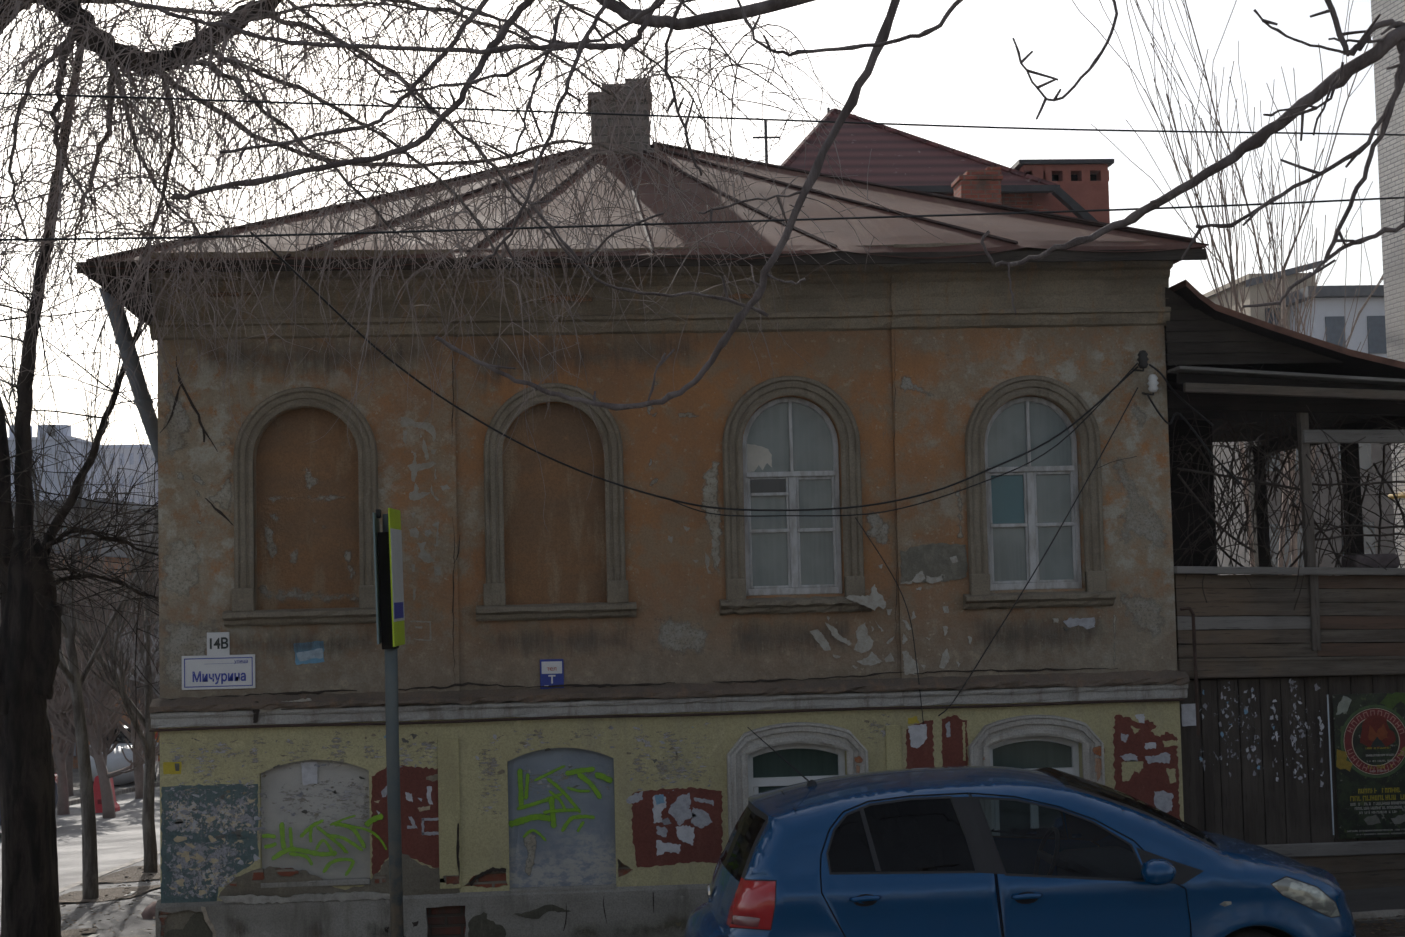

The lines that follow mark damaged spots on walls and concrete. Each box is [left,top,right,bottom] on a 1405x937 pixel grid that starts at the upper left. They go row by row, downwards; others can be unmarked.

peeling [693,462,722,574]
peeling [901,556,958,590]
peeling [810,606,960,675]
peeling [1052,617,1095,631]
peeling [945,721,966,761]
peeling [1113,715,1181,820]
peeling [161,784,267,903]
flaking render [465,867,508,888]